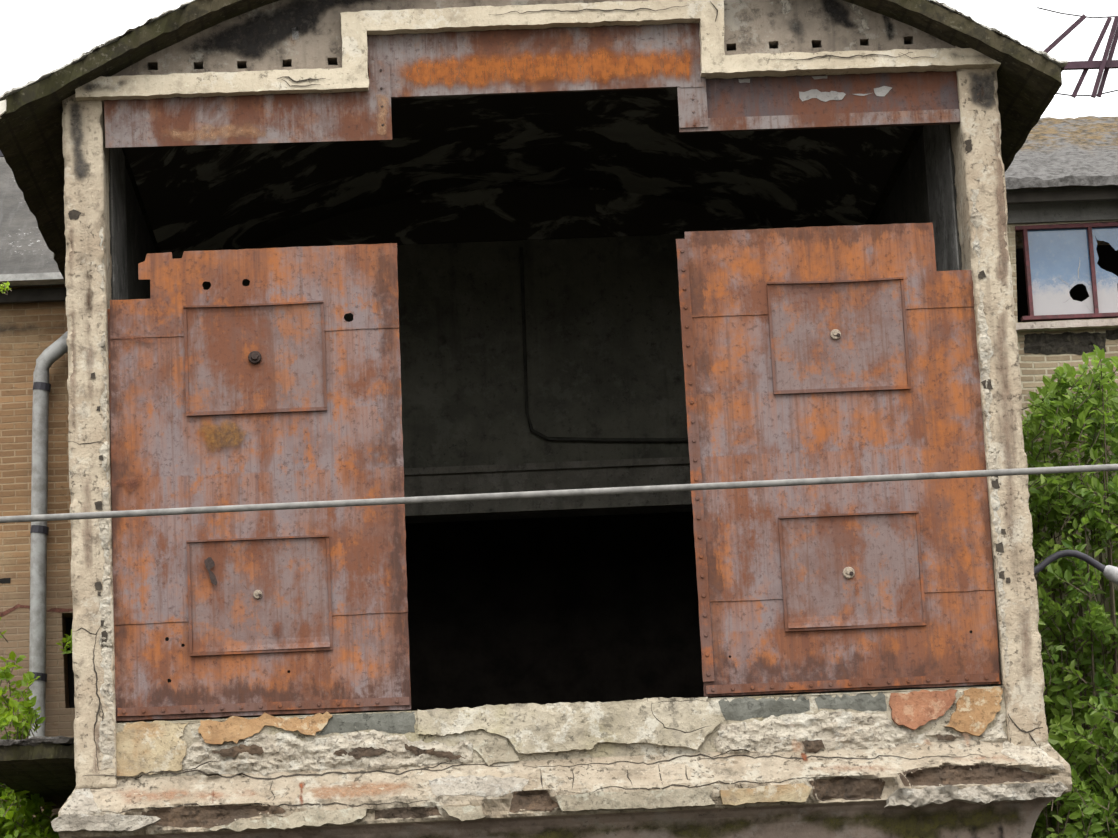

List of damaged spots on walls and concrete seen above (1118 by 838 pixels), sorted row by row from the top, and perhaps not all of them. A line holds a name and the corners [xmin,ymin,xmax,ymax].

rust [402,49,691,87]
peeling [799,75,892,102]
rust [204,557,217,585]
crack [0,604,1043,813]
spalling [60,788,101,816]